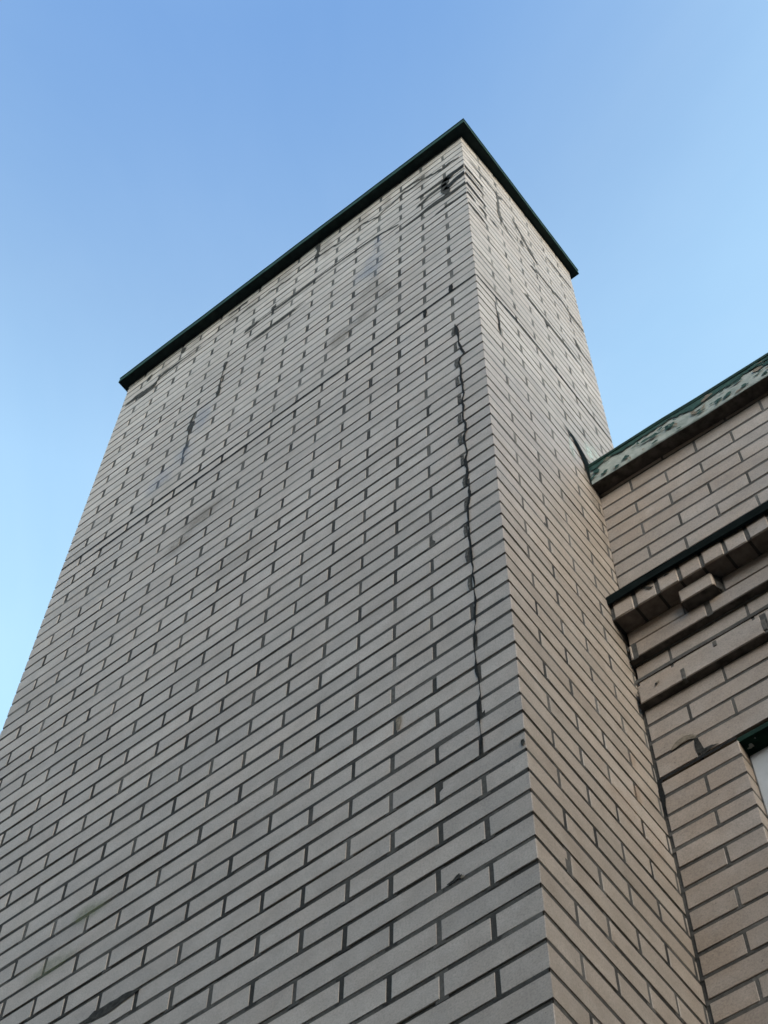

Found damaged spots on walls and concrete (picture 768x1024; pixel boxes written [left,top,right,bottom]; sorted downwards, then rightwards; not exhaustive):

crack [210,156,515,338]
crack [182,361,228,458]
peeling [589,357,768,479]
crack [451,324,483,755]